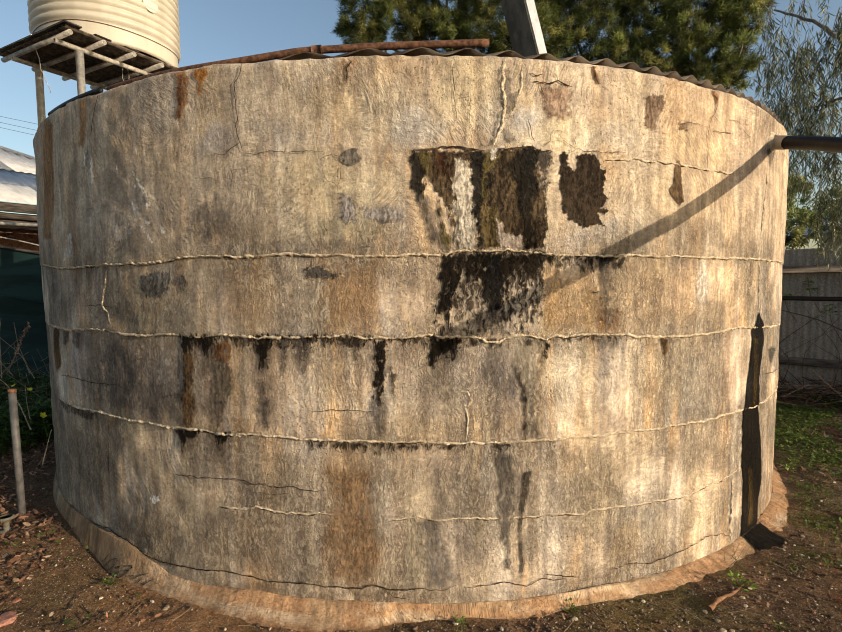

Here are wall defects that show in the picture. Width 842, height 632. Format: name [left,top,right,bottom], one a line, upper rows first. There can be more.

rust [171,68,207,121]
crack [214,67,342,190]
leakage [644,94,666,130]
leakage [670,161,684,206]
leakage [174,66,628,452]
leakage [741,312,786,551]
crack [92,522,574,599]
leakage [493,441,532,576]